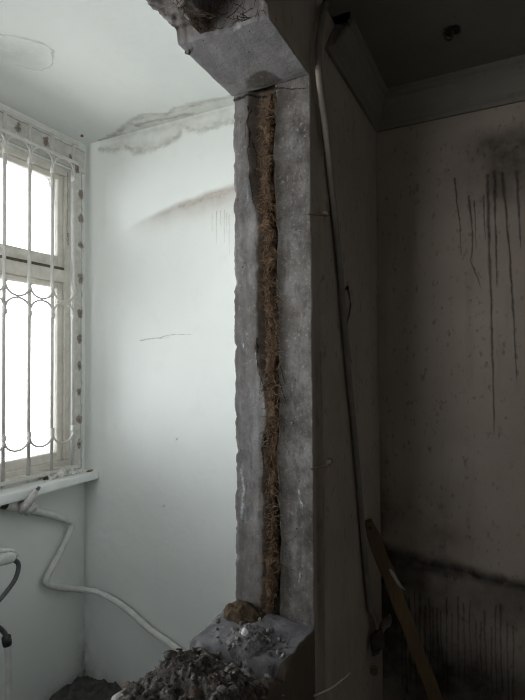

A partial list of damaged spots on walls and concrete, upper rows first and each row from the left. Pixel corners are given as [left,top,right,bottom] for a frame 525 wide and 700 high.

crack [256,338,286,403]
crack [260,434,268,471]